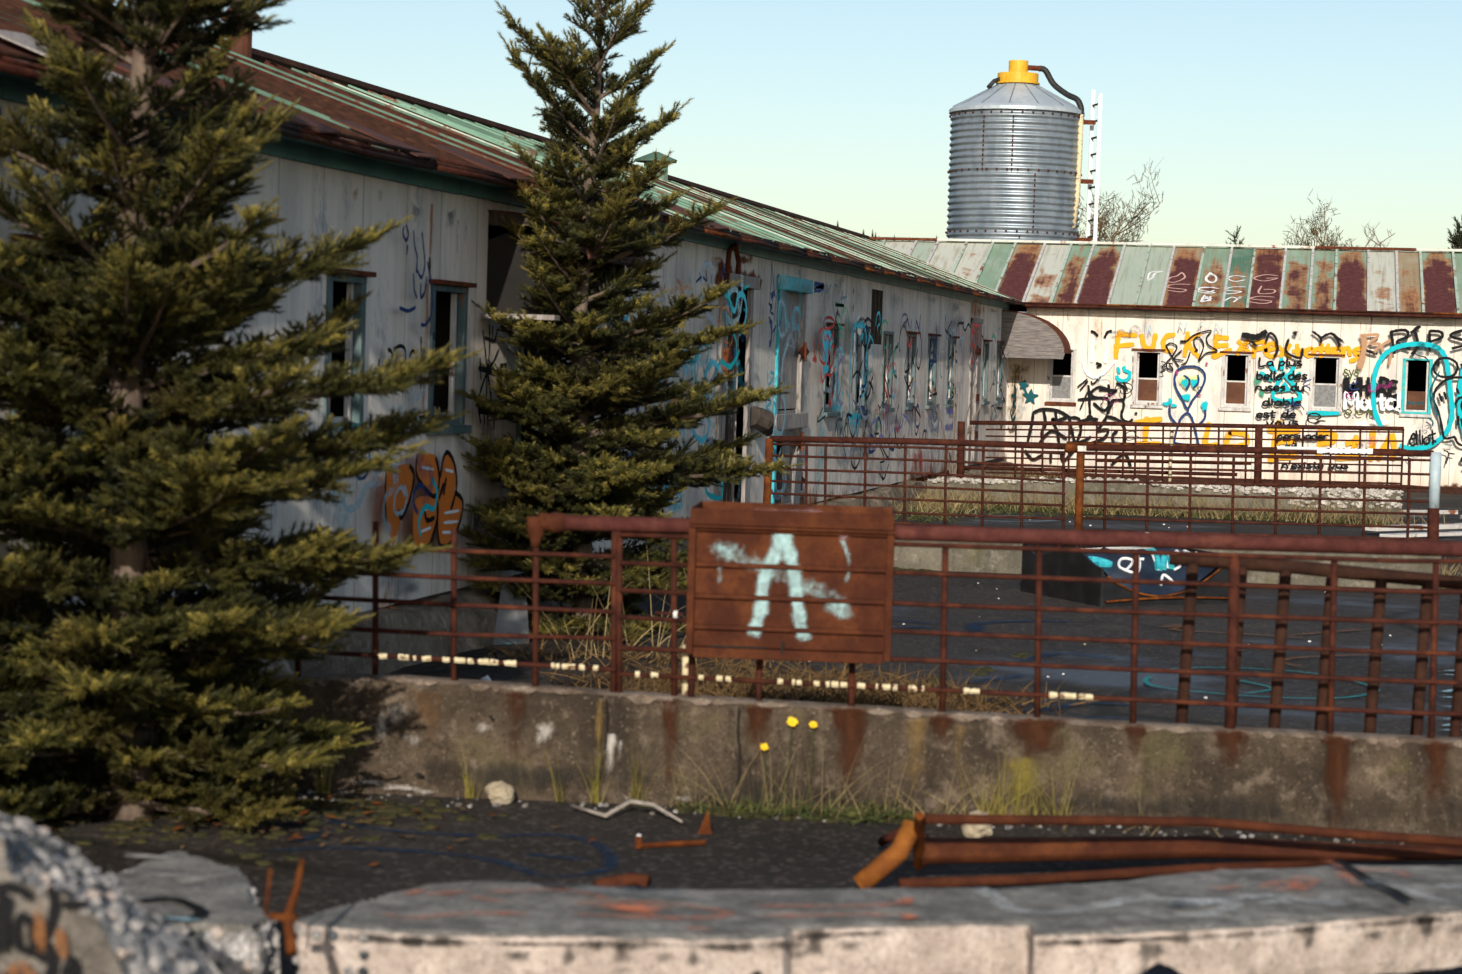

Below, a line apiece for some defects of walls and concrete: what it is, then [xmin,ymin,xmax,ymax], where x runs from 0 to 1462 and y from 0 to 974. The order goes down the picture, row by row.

corrosion [748,705,772,754]
corrosion [829,707,867,779]
corrosion [1011,718,1066,790]
corrosion [1323,734,1352,815]